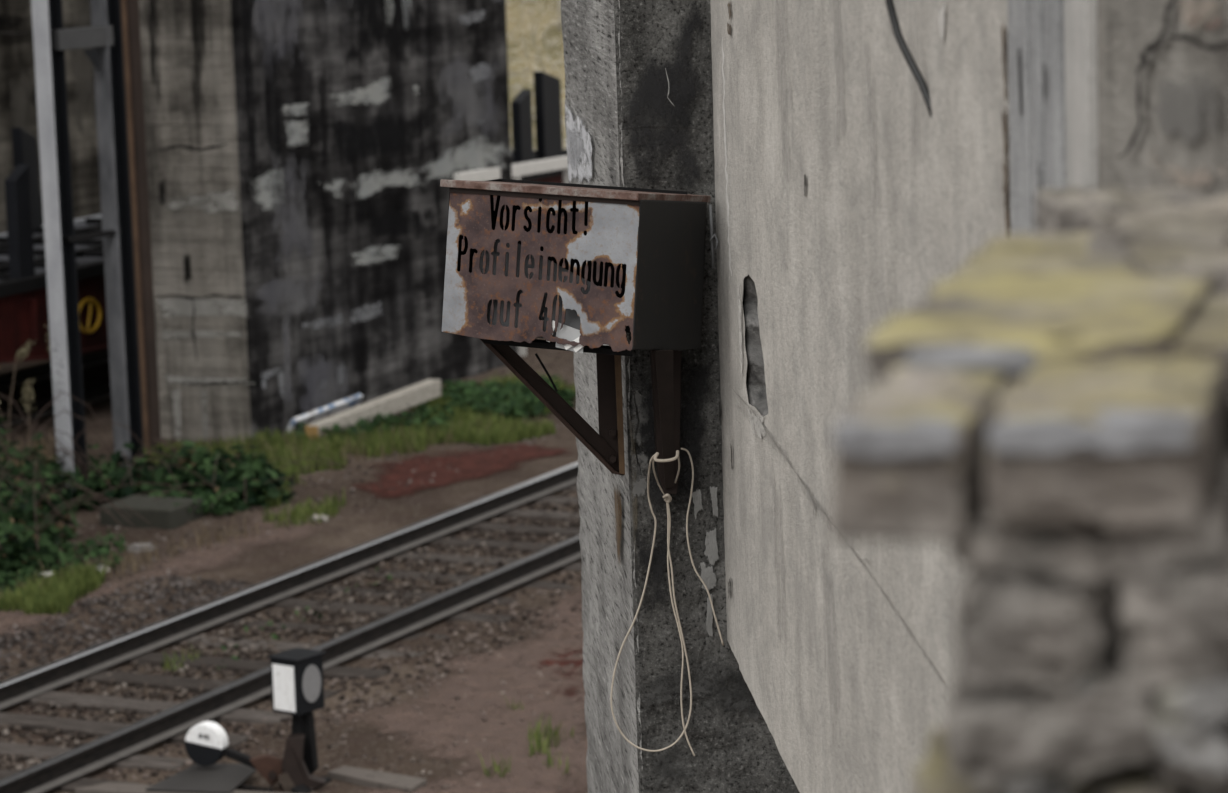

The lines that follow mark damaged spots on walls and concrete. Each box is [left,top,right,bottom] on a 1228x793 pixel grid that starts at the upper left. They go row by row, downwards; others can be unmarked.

crack [1118,0,1228,158]
damp [283,302,381,413]
spalling [737,274,768,439]